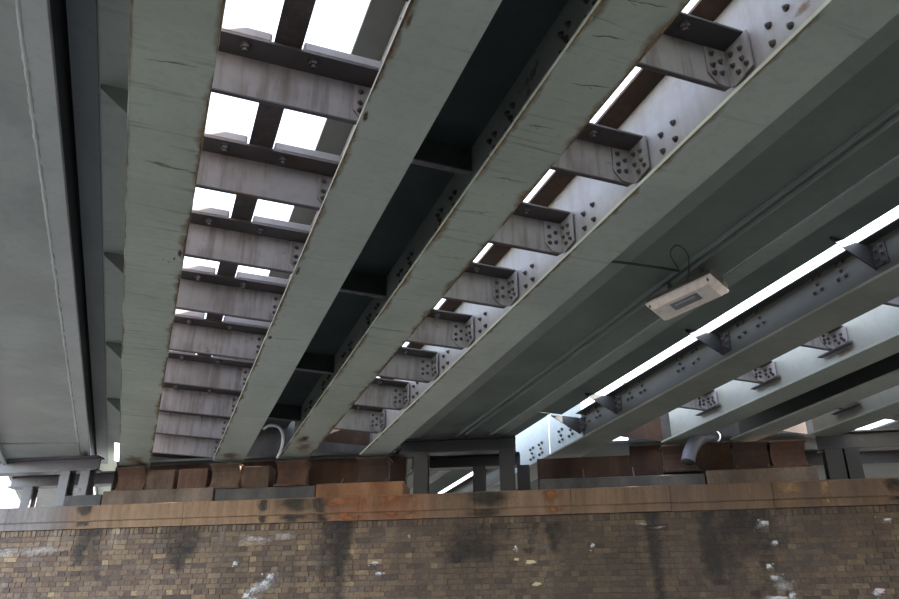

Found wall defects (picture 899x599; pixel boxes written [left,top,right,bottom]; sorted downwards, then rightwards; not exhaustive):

corrosion [218,0,226,47]
corrosion [153,79,213,194]
corrosion [119,210,192,464]
leakage [75,506,100,561]
leakage [259,500,267,523]
leakage [281,498,350,599]
leakage [451,492,505,562]
leakage [644,512,663,593]
leakage [701,509,778,581]